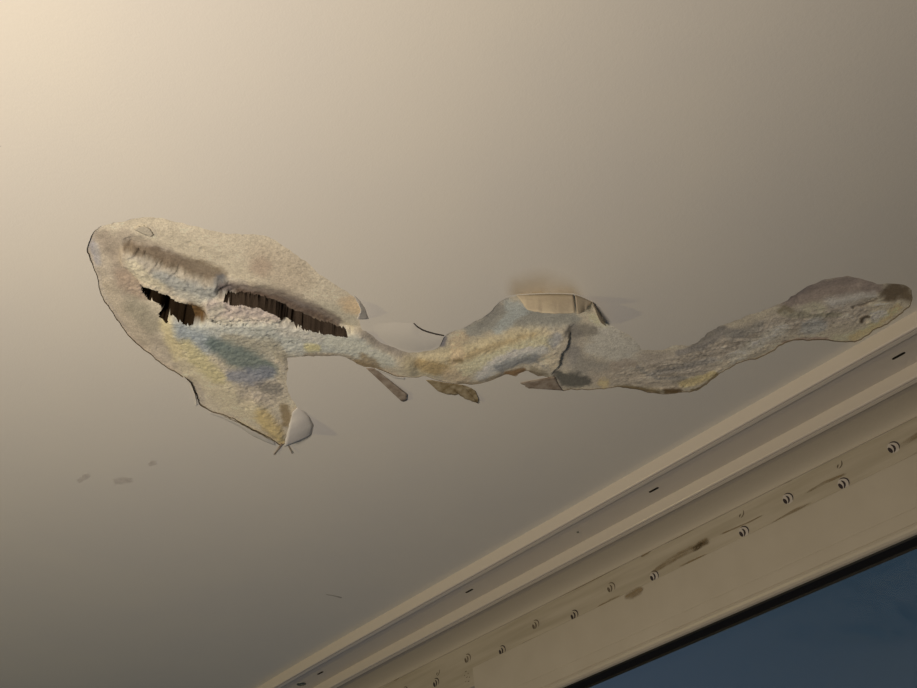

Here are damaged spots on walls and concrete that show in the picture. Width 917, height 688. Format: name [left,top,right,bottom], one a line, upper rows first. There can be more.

flaking render [87,217,910,455]